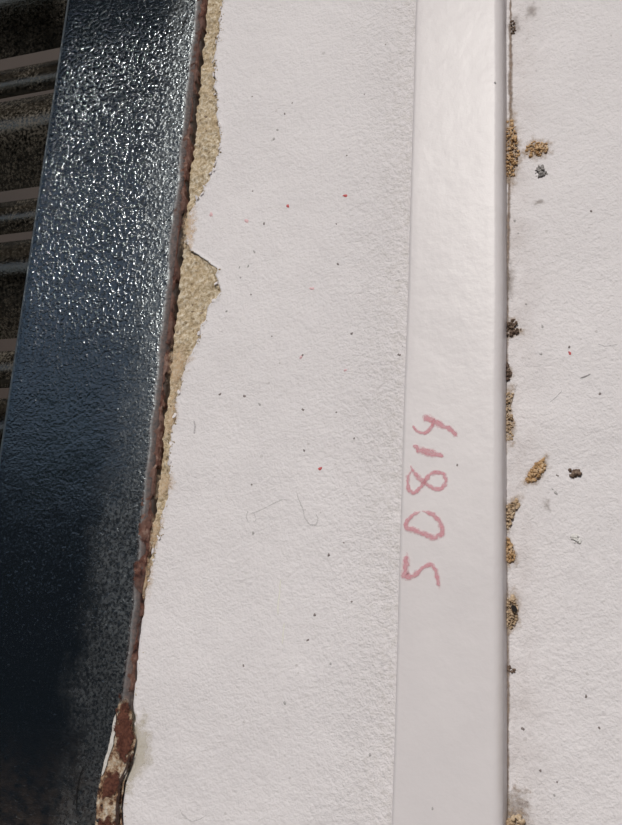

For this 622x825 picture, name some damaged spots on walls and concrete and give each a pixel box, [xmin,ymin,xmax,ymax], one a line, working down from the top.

rust [127,0,208,692]
spalling [148,0,224,582]
rust [102,771,122,798]
rust [113,694,134,765]